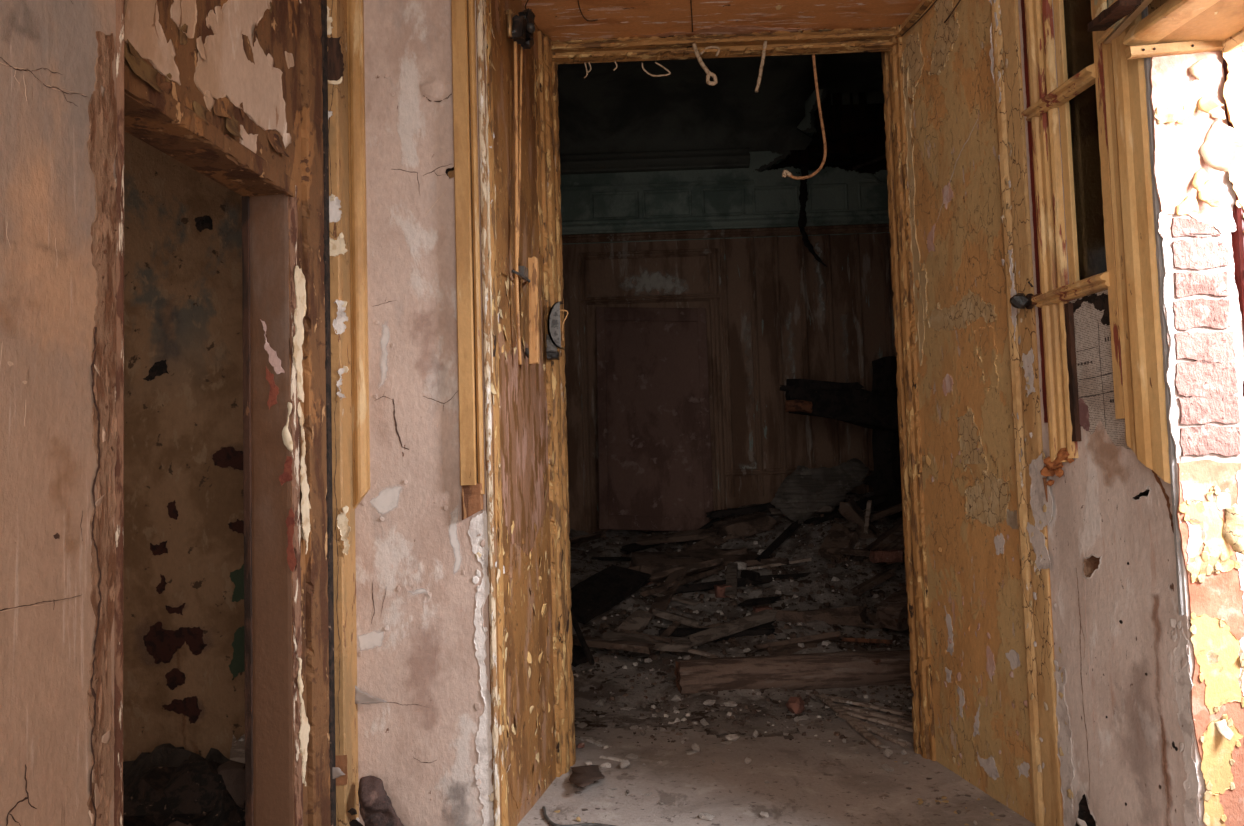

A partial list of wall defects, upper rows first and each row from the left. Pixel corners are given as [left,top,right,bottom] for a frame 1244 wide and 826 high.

crack [0,57,87,106]
peeling [1222,48,1244,132]
spalling [87,0,294,826]
peeling [1170,607,1244,826]
crack [6,764,37,826]